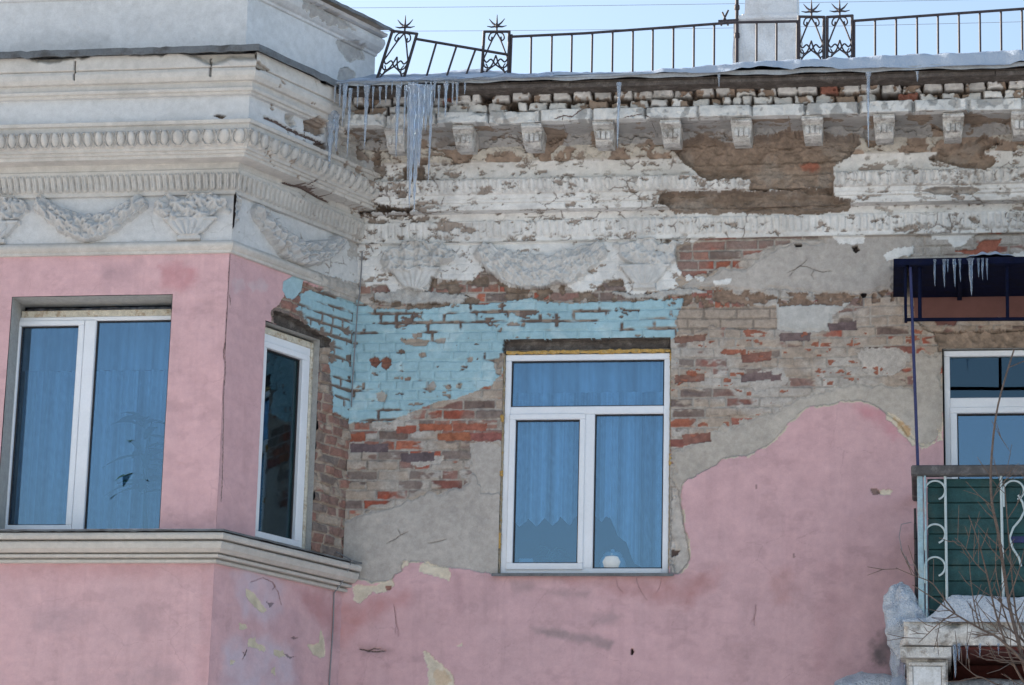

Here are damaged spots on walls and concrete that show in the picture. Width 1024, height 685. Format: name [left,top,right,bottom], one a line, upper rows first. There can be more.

crack [221,261,231,499]
spalling [268,232,1024,603]